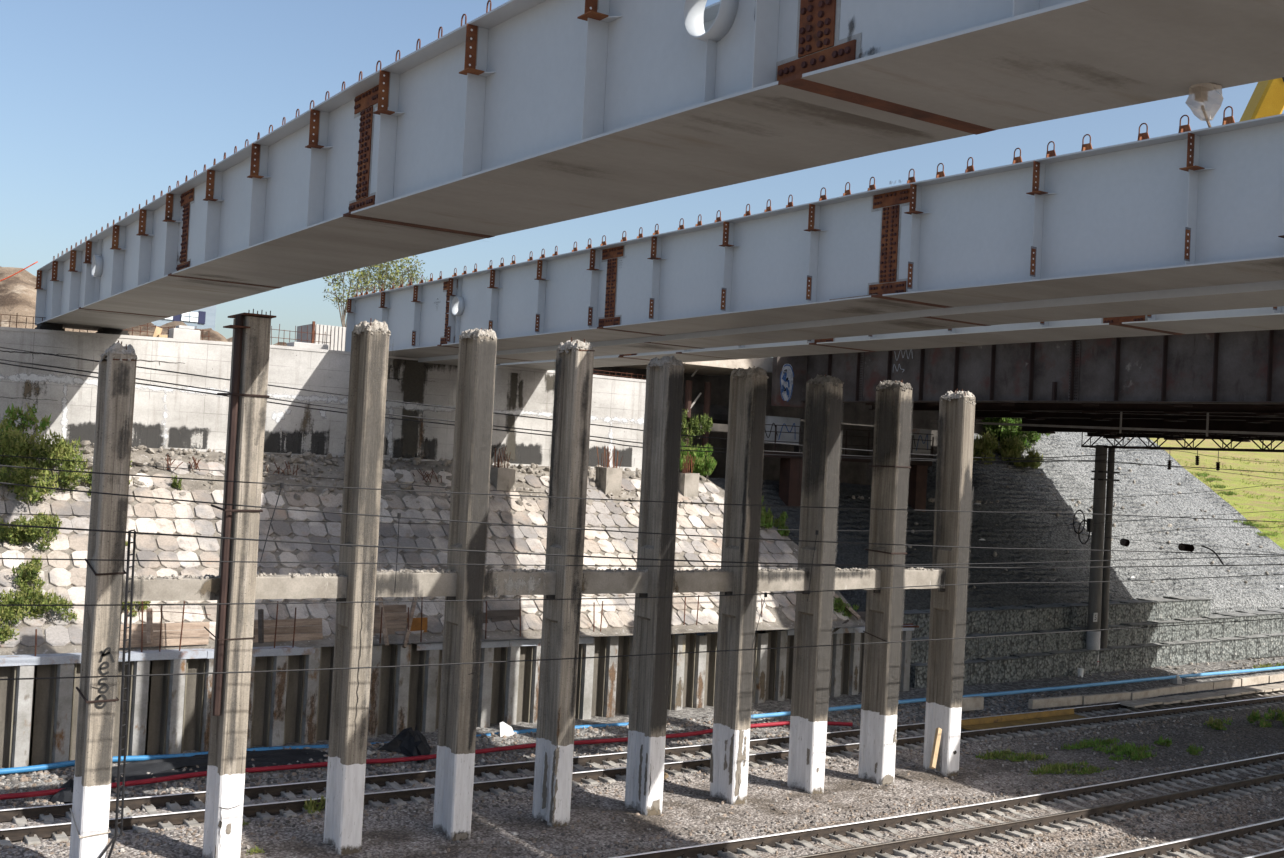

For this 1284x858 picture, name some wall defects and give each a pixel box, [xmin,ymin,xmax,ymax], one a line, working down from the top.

water stain [191,433,203,447]
water stain [280,430,311,452]